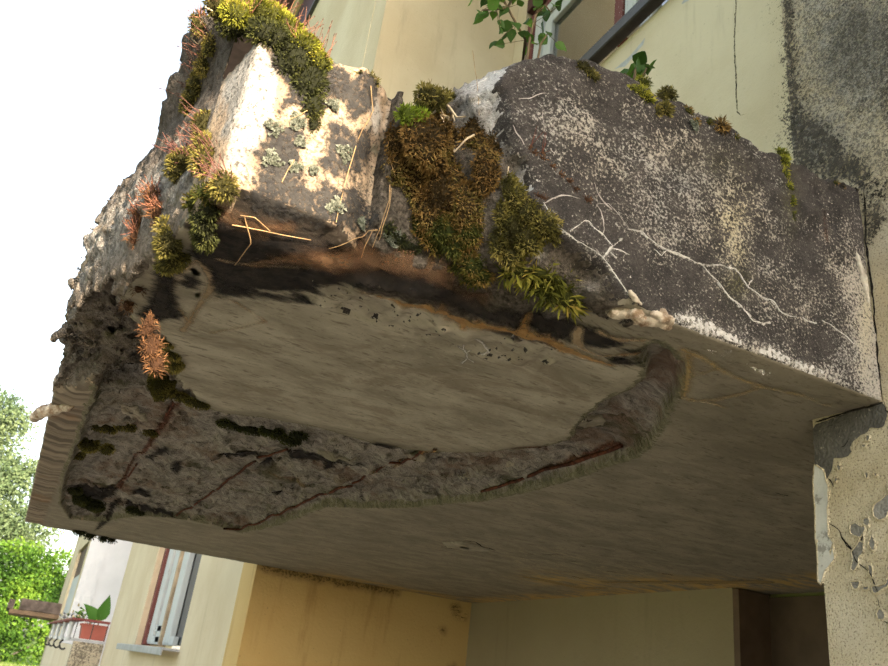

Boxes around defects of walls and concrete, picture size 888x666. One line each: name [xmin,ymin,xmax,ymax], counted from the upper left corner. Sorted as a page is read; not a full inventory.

crack [734,0,744,115]
water stain [767,0,888,245]
spalling [50,15,696,534]
water stain [572,327,646,365]
water stain [607,290,742,352]
crack [543,184,859,344]
water stain [759,345,824,376]
flaking render [812,463,842,585]
peeling [848,485,888,632]